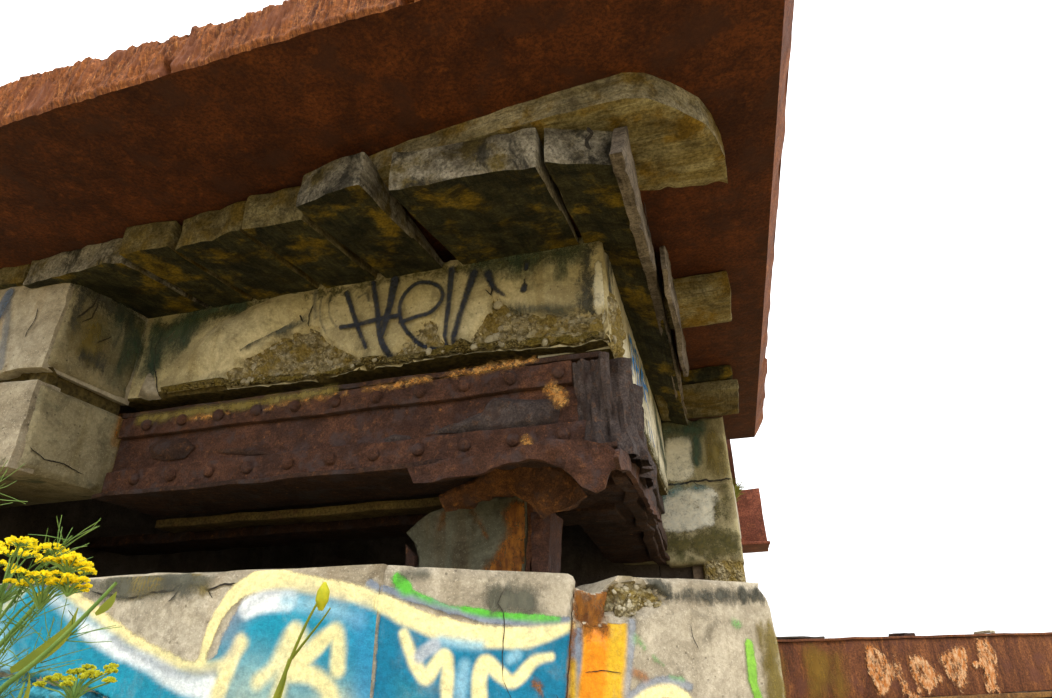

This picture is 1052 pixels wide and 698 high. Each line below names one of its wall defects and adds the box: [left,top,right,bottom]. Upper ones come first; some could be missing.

damp [70,281,273,376]
spalling [160,261,626,393]
peeling [543,383,567,406]
rust [572,352,669,493]
rust [484,499,525,571]
damp [667,484,742,560]
rust [864,637,1001,698]